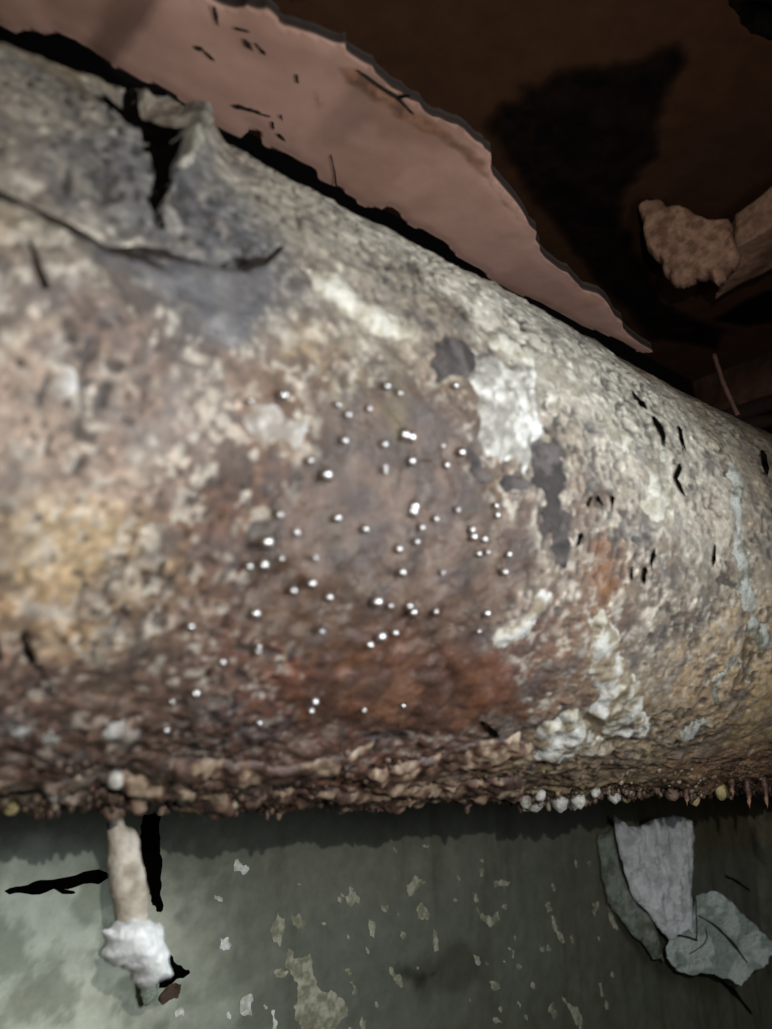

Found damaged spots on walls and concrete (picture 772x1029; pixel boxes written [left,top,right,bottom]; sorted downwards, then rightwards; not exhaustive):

spalling [234,27,266,55]
crack [0,84,284,271]
damp [294,259,423,340]
damp [468,331,588,474]
damp [243,375,553,653]
damp [639,444,676,522]
corrosion [287,623,523,730]
efflorescence [533,609,651,765]
peeling [407,876,439,952]
peeling [473,893,507,927]
peeling [270,912,366,1029]
peeling [548,997,583,1029]